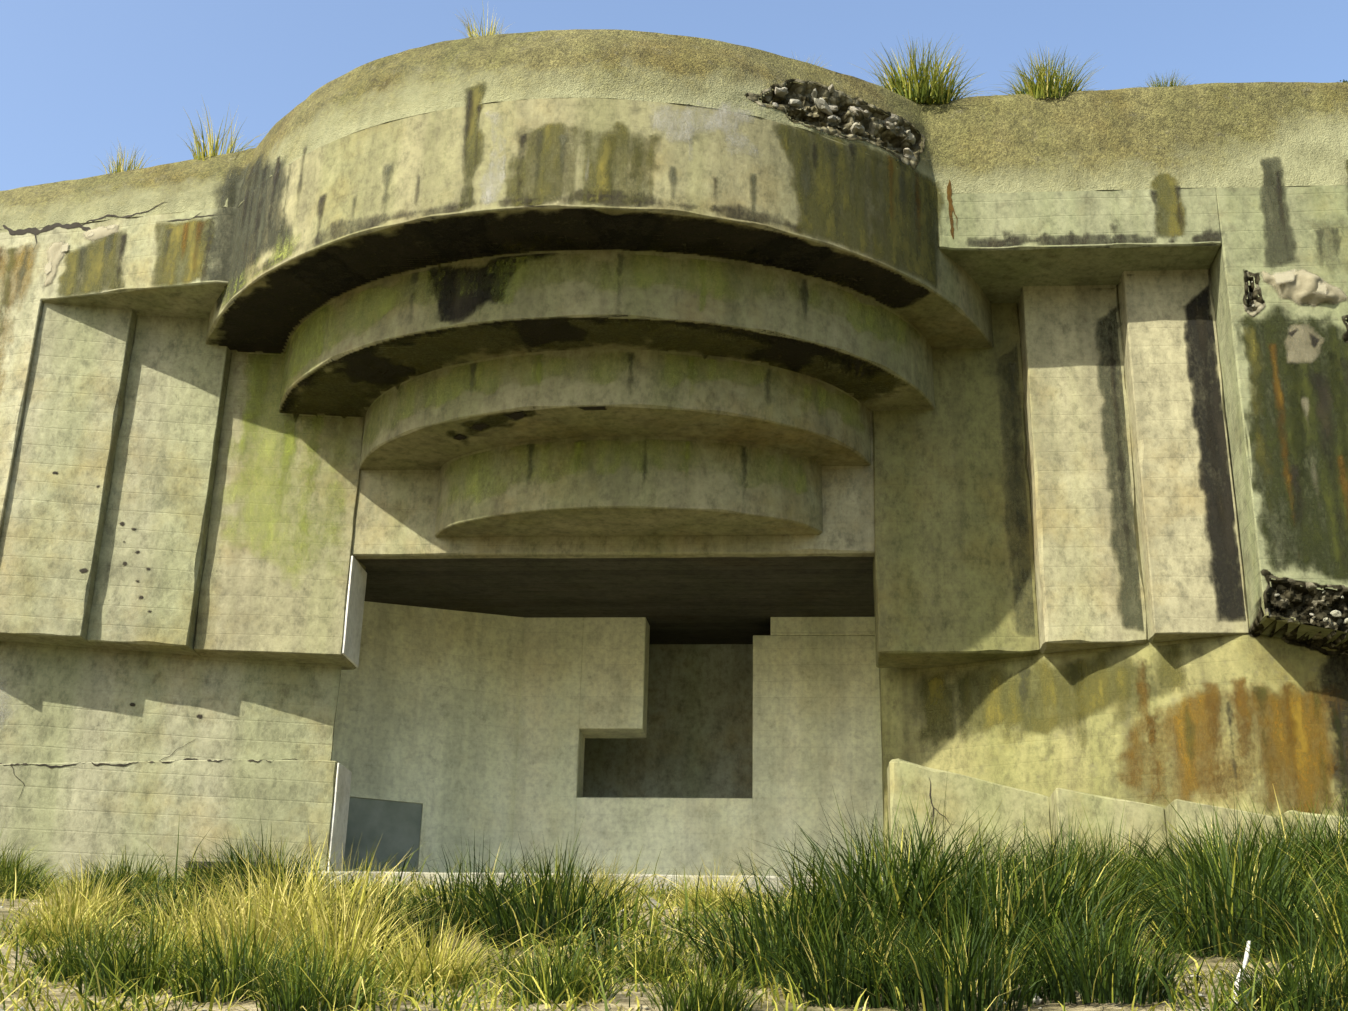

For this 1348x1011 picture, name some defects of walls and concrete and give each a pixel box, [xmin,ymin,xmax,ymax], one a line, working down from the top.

spalling [745,79,925,169]
crack [0,202,216,252]
leakage [1261,158,1296,266]
rust [0,247,33,329]
leakage [153,84,943,464]
spalling [1243,269,1265,316]
leakage [1245,328,1348,516]
spalling [1248,569,1348,655]
crack [0,739,297,801]
rust [1121,678,1344,814]